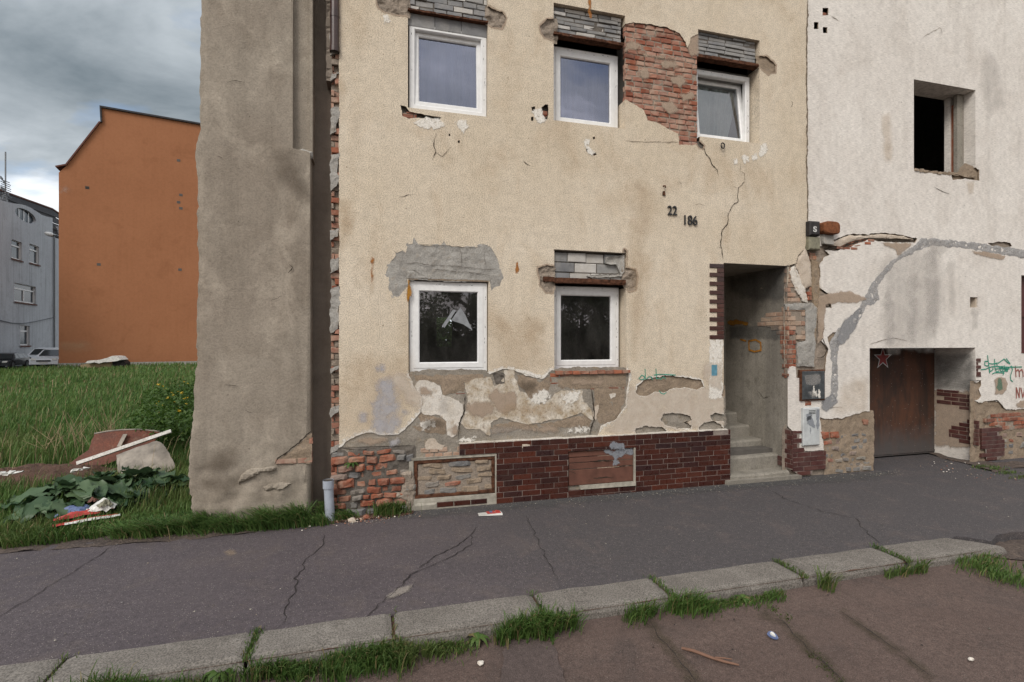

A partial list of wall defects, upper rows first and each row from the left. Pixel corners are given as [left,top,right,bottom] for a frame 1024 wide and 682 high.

spalling [376,0,410,18]
spalling [484,5,507,30]
spalling [401,106,440,119]
flaking render [623,23,705,150]
crack [681,149,745,256]
spalling [783,246,836,378]
spalling [339,366,704,475]
spalling [635,413,724,433]
spalling [969,381,1024,462]